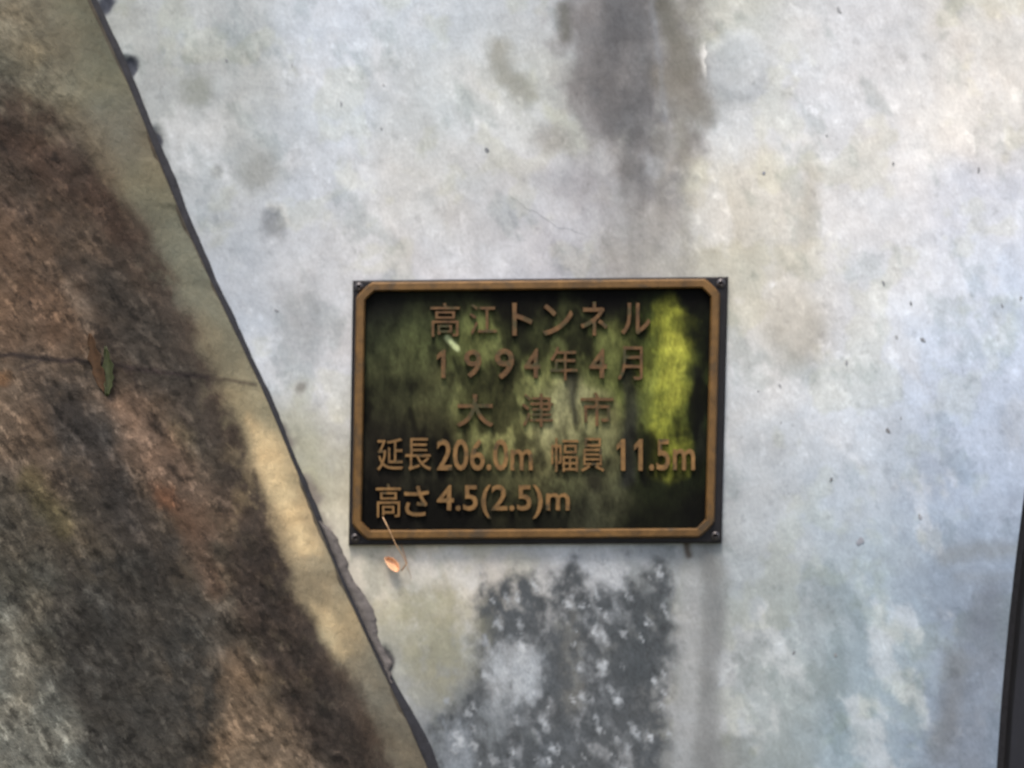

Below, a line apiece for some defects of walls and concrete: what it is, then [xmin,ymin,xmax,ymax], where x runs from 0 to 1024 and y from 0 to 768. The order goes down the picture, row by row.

damp [477,0,735,278]